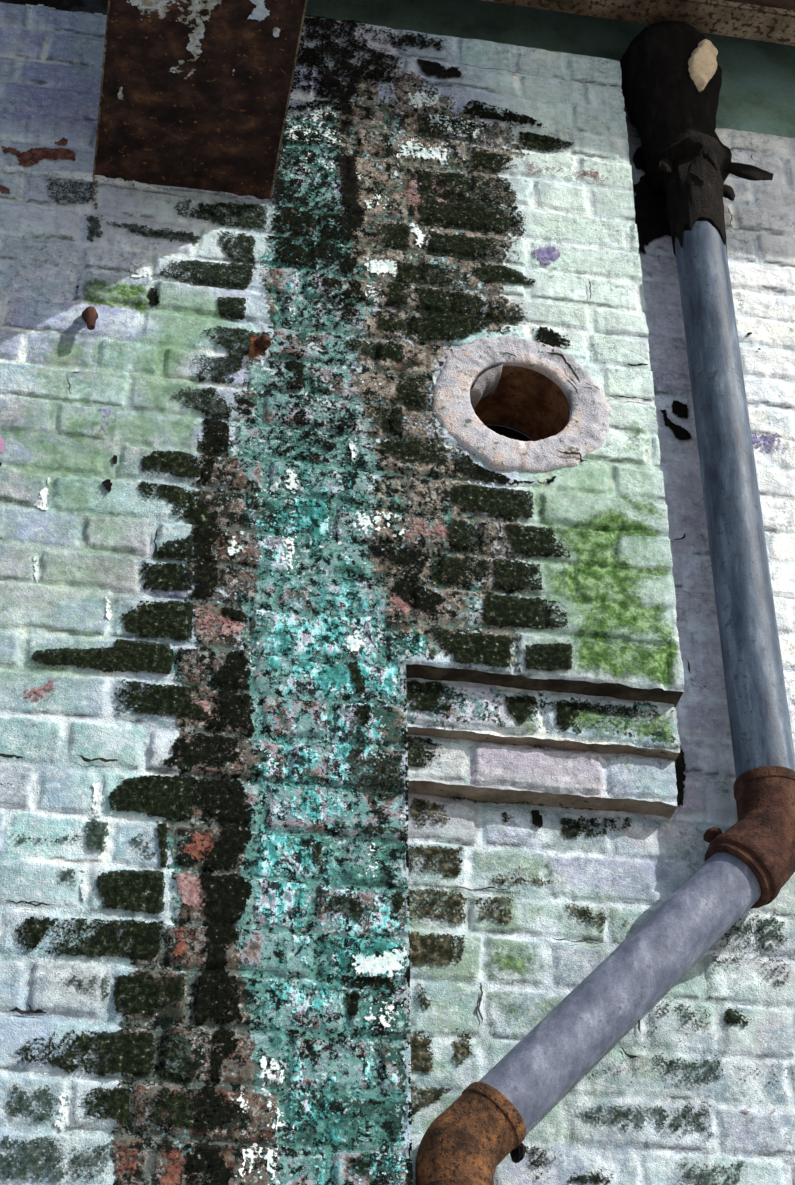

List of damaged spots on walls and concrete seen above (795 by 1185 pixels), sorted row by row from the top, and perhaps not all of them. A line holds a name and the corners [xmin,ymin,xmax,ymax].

leakage [417,59,462,79]
leakage [46,177,201,245]
leakage [174,199,269,231]
leakage [159,230,257,290]
leakage [217,296,248,321]
leakage [532,326,573,352]
peeling [387,591,427,619]
peeling [192,608,244,637]
leakage [525,643,573,671]
leakage [9,819,109,853]
leakage [96,869,166,915]
leakage [0,1134,69,1183]